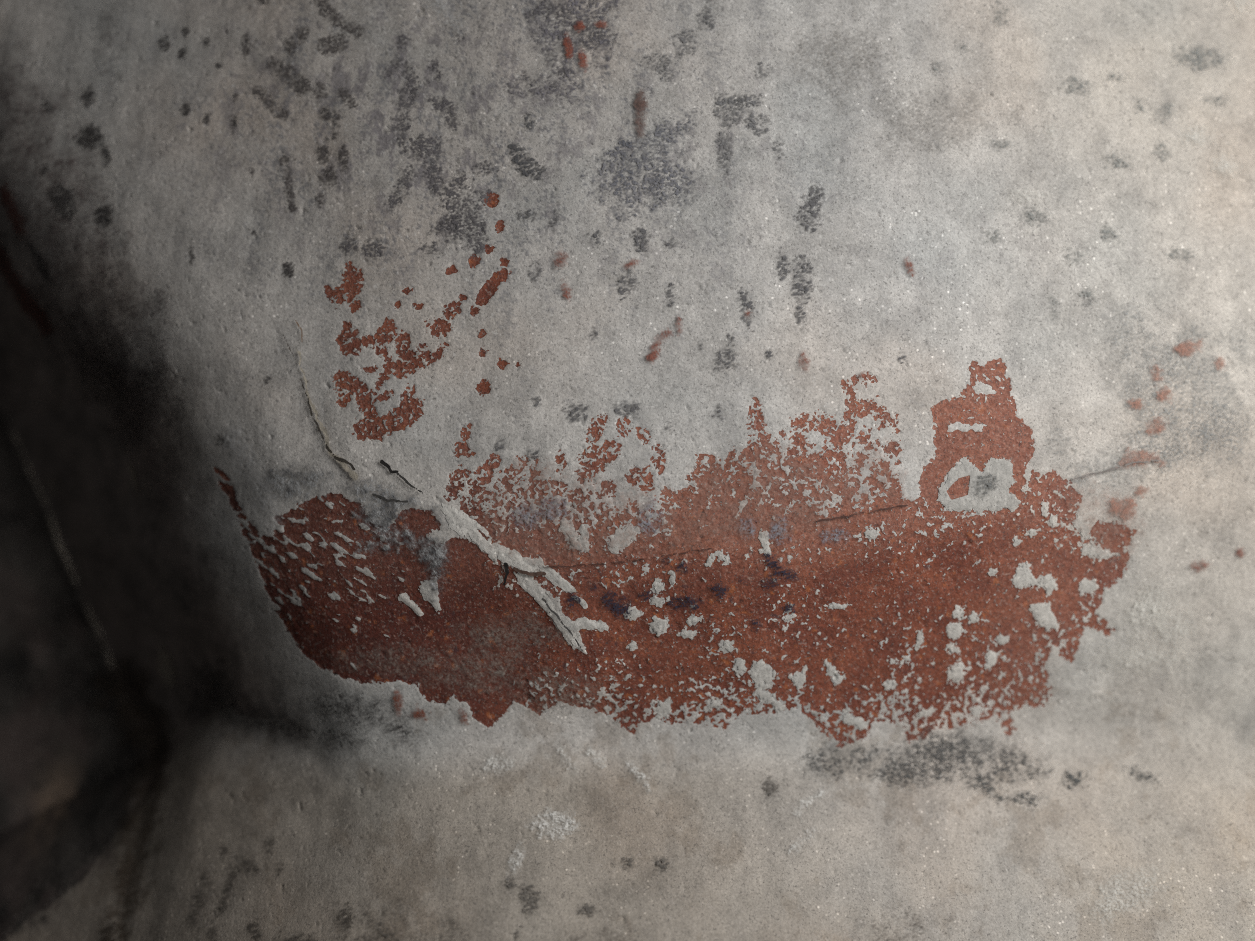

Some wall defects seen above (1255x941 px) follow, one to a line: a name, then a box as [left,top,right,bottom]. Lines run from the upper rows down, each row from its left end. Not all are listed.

water stain [508,0,619,103]
water stain [267,0,364,212]
water stain [384,34,499,258]
water stain [508,144,547,180]
water stain [581,111,698,252]
water stain [714,92,784,173]
water stain [798,185,826,233]
water stain [778,247,814,323]
peeling [647,317,681,361]
crack [283,320,423,503]
peeling [214,358,1146,748]
water stain [803,728,1050,805]